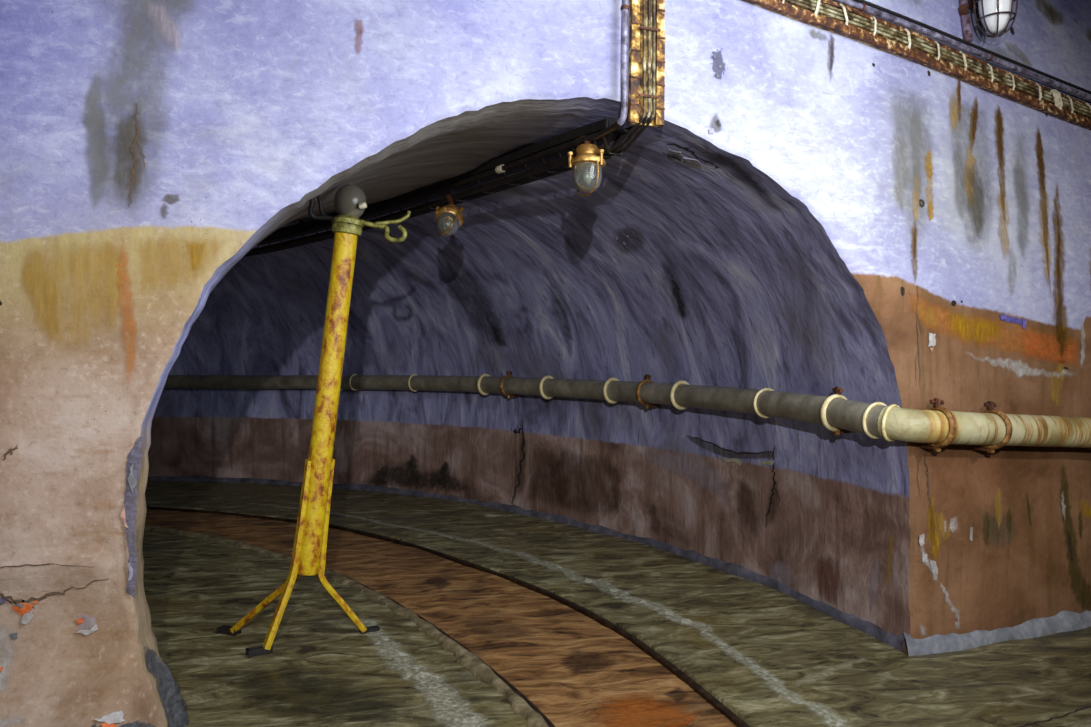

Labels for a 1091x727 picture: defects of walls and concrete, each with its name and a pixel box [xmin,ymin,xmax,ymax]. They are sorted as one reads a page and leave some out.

leakage [85,0,189,201]
leakage [899,112,933,220]
rust [951,79,978,201]
leakage [957,174,984,229]
rust [915,132,1076,377]
rust [995,107,1008,246]
spalling [0,591,38,640]
crack [0,563,108,609]
peeling [76,616,98,635]
leakage [1061,471,1091,607]
spalling [92,710,155,727]
spalling [144,647,189,727]